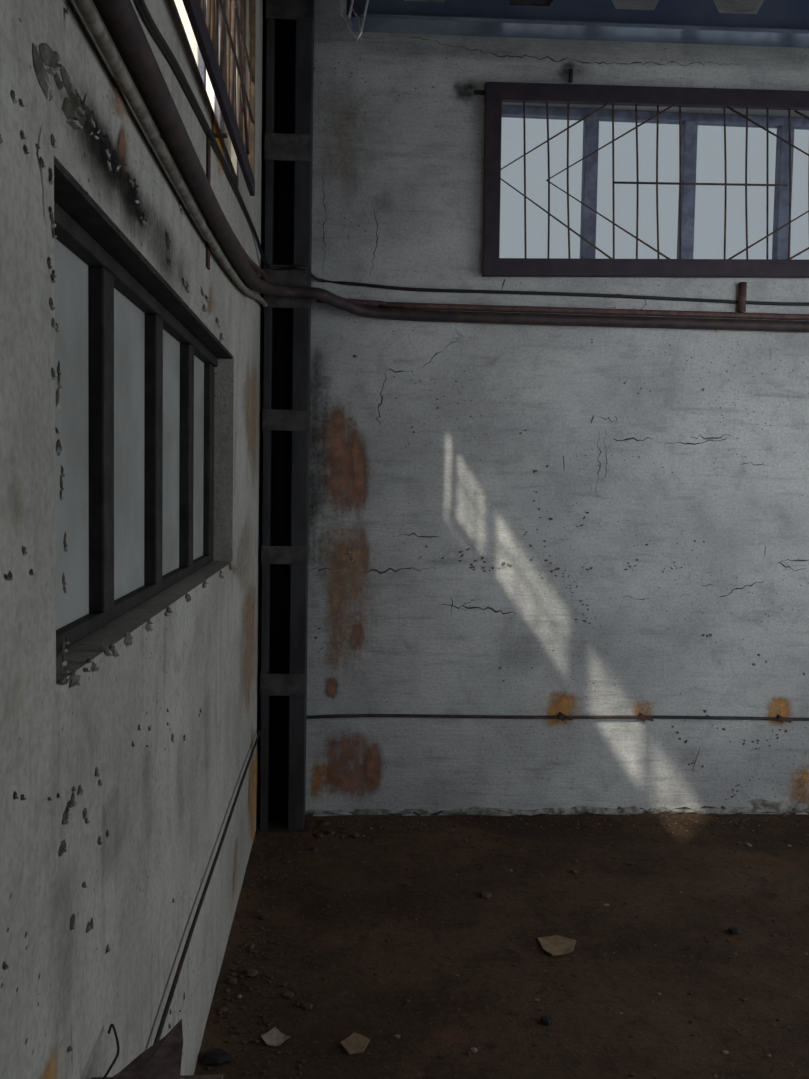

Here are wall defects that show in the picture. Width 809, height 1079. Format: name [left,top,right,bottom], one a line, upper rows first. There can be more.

damp [77,105,182,273]
crack [375,331,464,424]
rust [323,409,367,510]
crack [591,414,731,498]
crack [680,546,808,597]
crack [442,597,516,615]
rust [548,694,574,724]
rust [769,698,790,724]
rust [312,735,382,795]